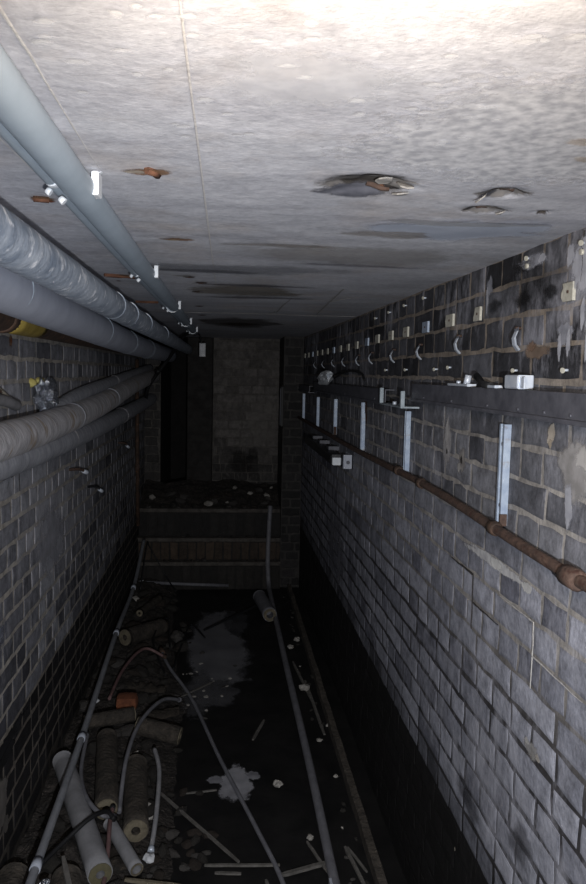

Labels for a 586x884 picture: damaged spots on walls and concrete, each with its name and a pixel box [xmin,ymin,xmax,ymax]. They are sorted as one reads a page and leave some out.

rust [125,167,170,179]
spalling [313,174,416,197]
spalling [462,187,531,215]